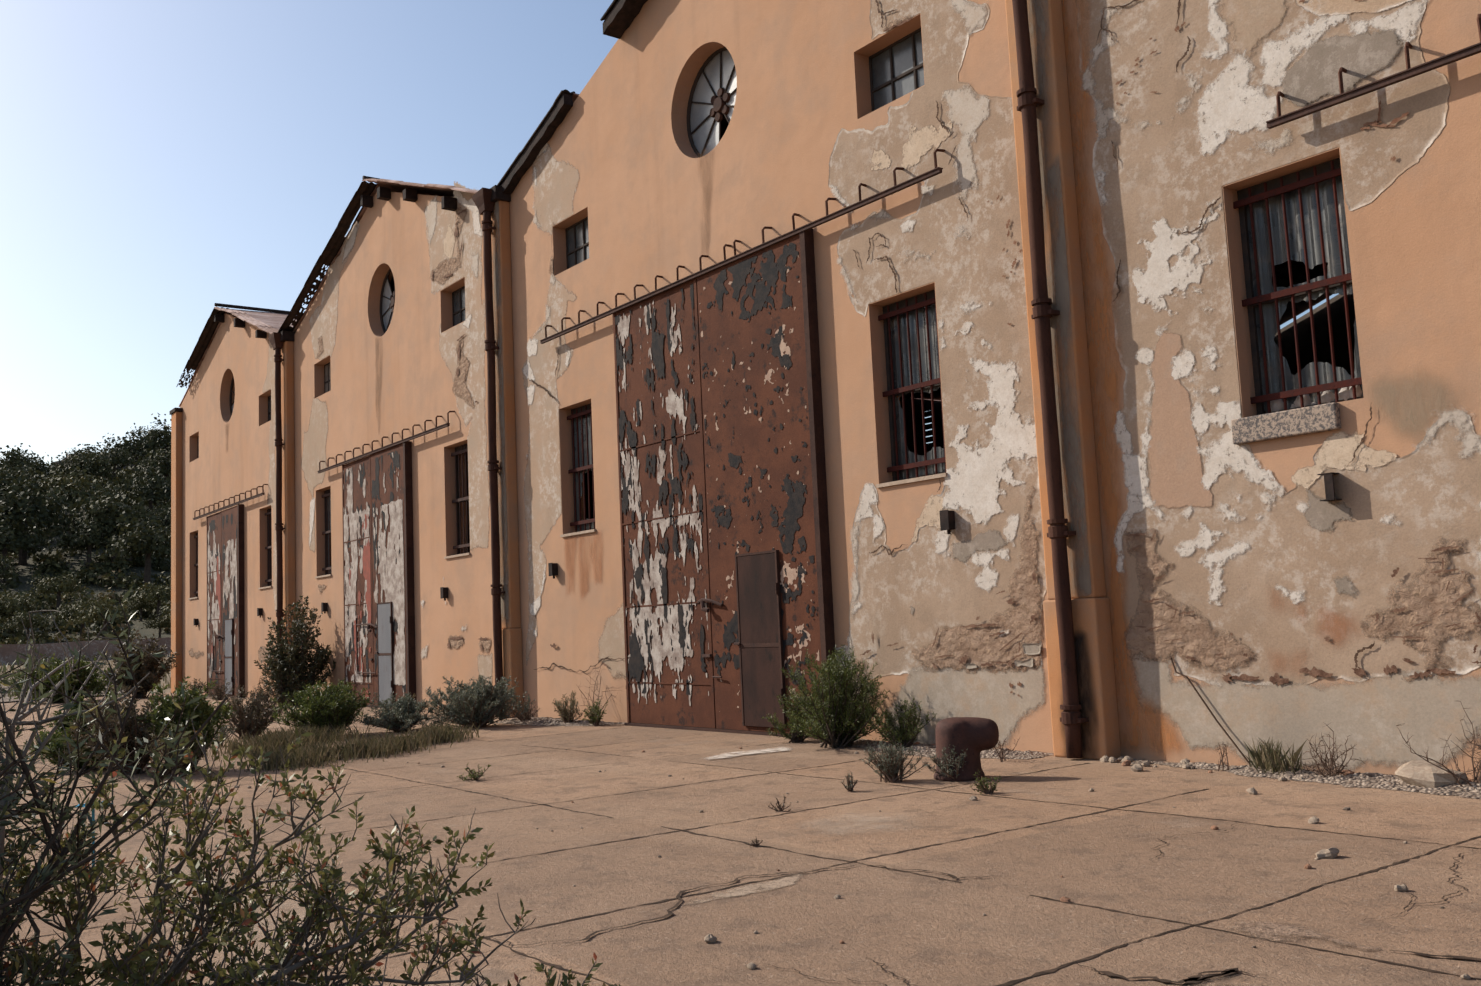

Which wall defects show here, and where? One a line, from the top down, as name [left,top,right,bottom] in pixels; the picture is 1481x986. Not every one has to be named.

peeling [425,182,490,549]
peeling [522,143,580,666]
peeling [773,0,1047,747]
peeling [1075,0,1481,770]
crack [414,864,988,981]
crack [765,954,917,986]
crack [1076,962,1255,984]
crack [1361,847,1481,960]